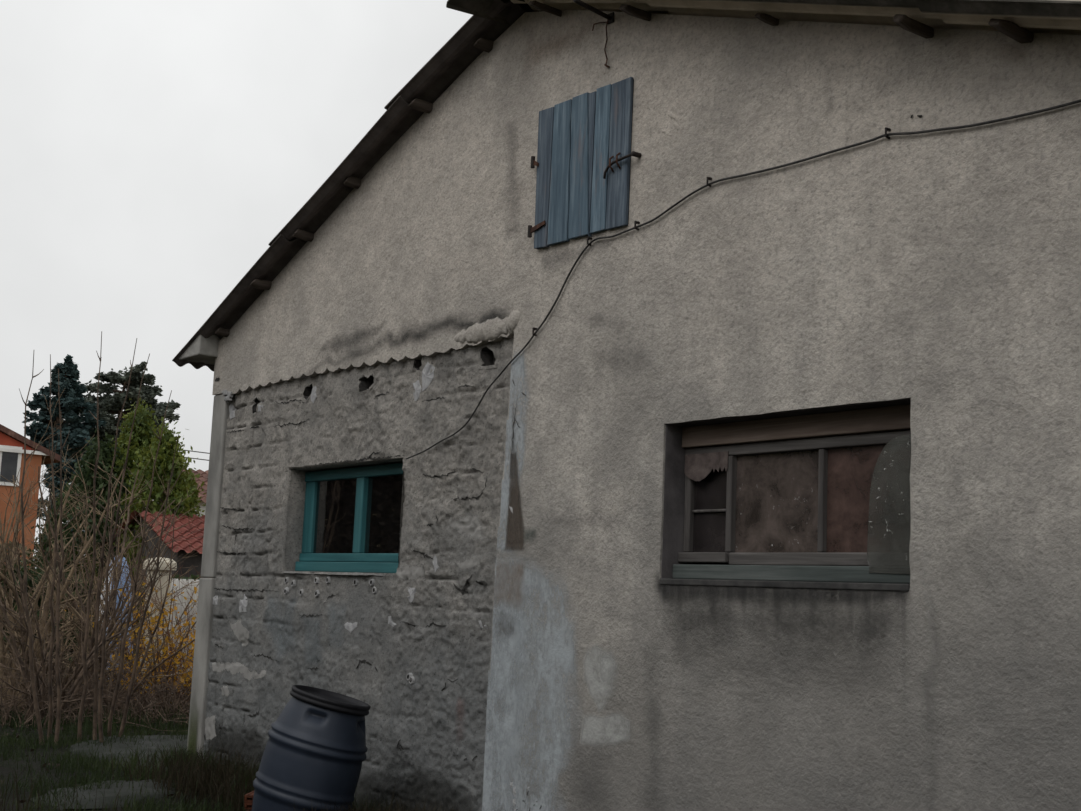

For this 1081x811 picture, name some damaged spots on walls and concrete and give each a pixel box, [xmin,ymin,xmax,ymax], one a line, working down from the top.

spalling [478,343,498,369]
spalling [301,381,317,403]
spalling [357,372,376,395]
spalling [412,356,435,401]
crack [228,399,308,433]
peeling [497,355,526,550]
crack [217,507,253,555]
crack [214,586,279,594]
water stain [658,582,902,601]
peeling [212,662,266,696]
peeling [479,562,629,811]
peeling [205,715,216,740]